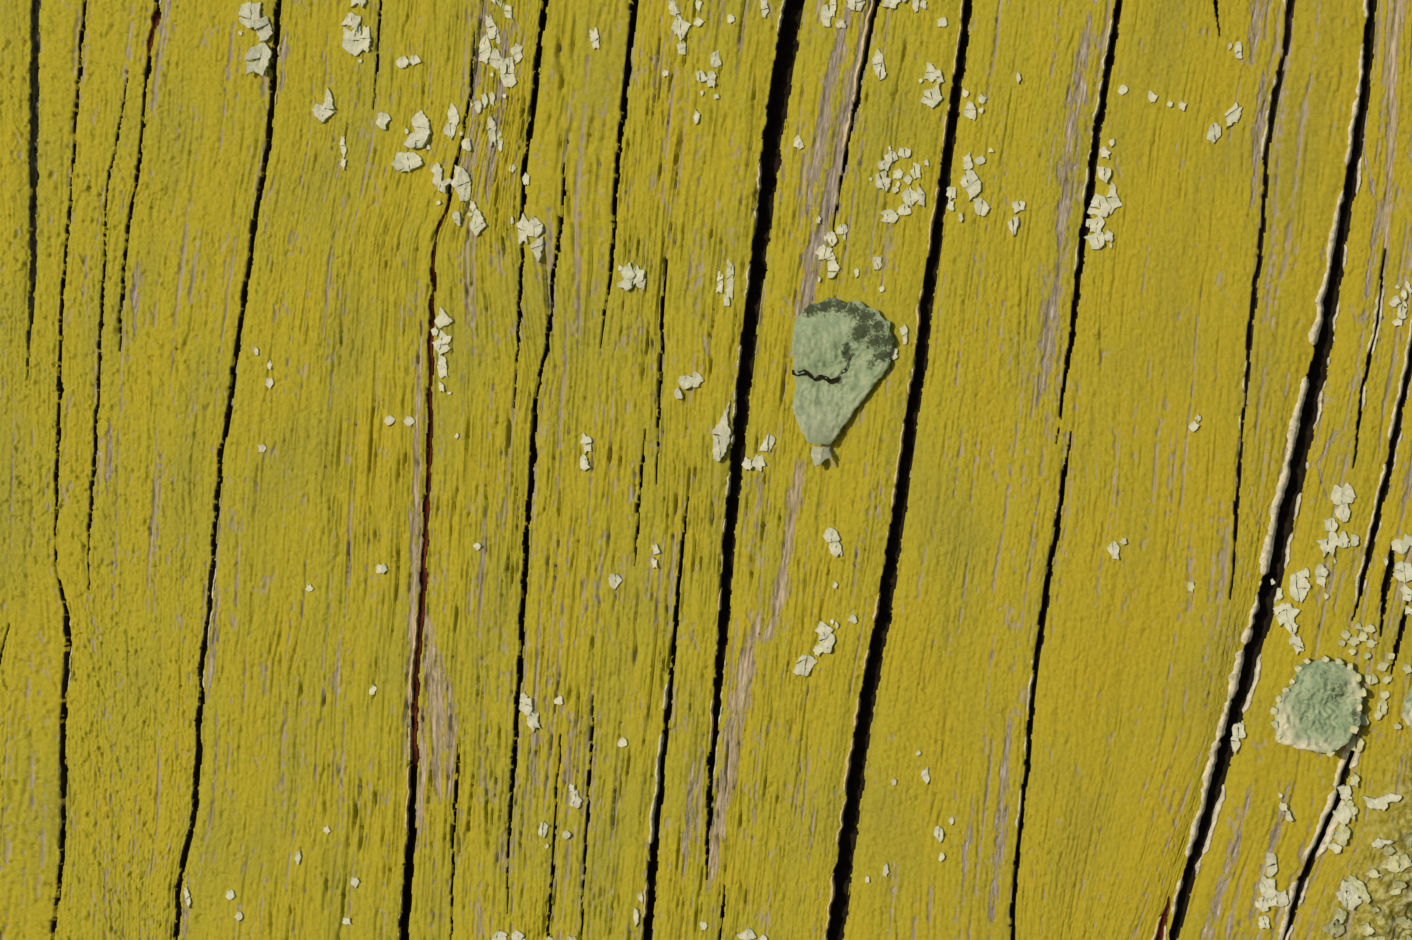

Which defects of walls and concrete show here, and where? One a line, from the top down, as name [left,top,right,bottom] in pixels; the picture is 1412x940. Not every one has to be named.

crack [27,0,162,940]
crack [173,0,282,940]
peeling [238,2,290,90]
peeling [376,0,530,237]
crack [706,0,805,940]
peeling [707,0,948,889]
crack [824,0,973,940]
peeling [946,148,994,223]
crack [1010,0,1123,940]
peeling [1084,139,1123,250]
crack [1151,0,1412,940]
peeling [1270,431,1412,757]